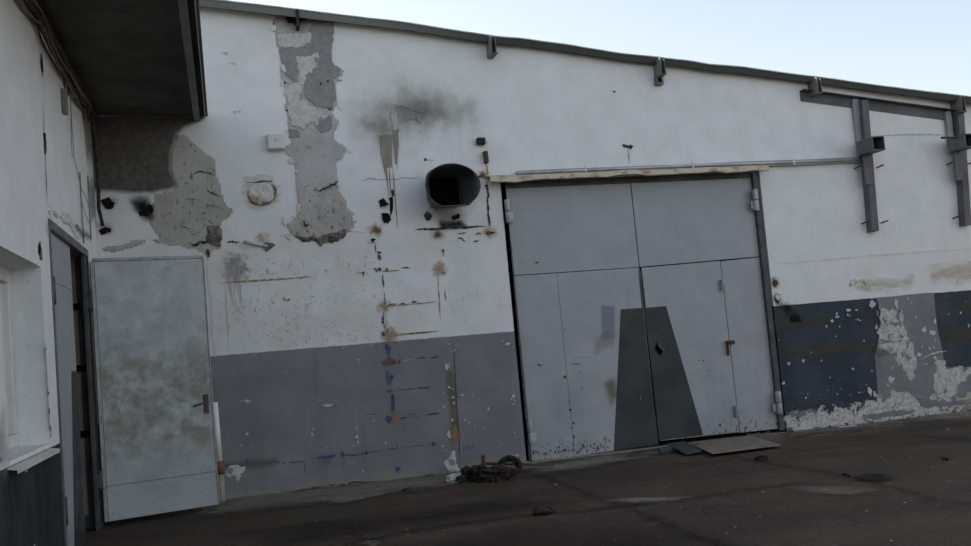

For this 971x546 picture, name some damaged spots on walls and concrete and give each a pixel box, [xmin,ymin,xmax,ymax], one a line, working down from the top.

flaking render [99,135,233,258]
flaking render [270,9,358,247]
damp [380,130,399,227]
rust [385,330,436,345]
rust [381,264,446,317]
peeling [783,293,971,431]